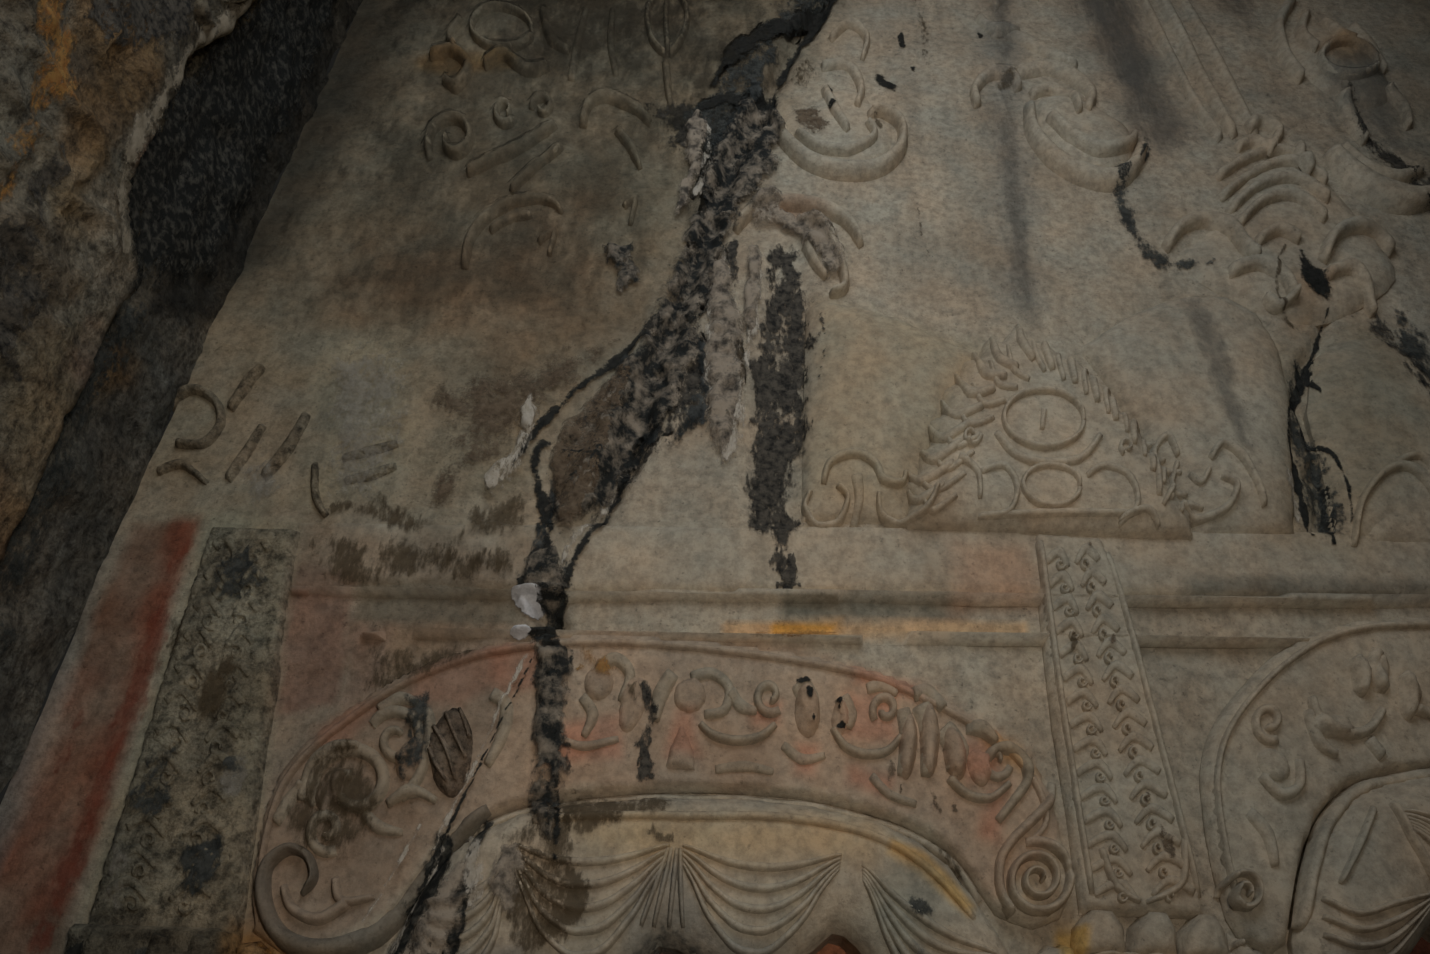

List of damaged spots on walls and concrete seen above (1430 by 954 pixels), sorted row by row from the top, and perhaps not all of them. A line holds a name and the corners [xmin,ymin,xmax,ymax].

leakage [646,0,833,209]
crack [698,0,837,123]
spalling [876,74,896,91]
leakage [1113,143,1215,270]
spalling [433,85,845,626]
leakage [1370,309,1430,394]
leakage [330,497,503,584]
crack [419,308,688,891]
leakage [488,212,825,734]
spalling [528,639,574,839]